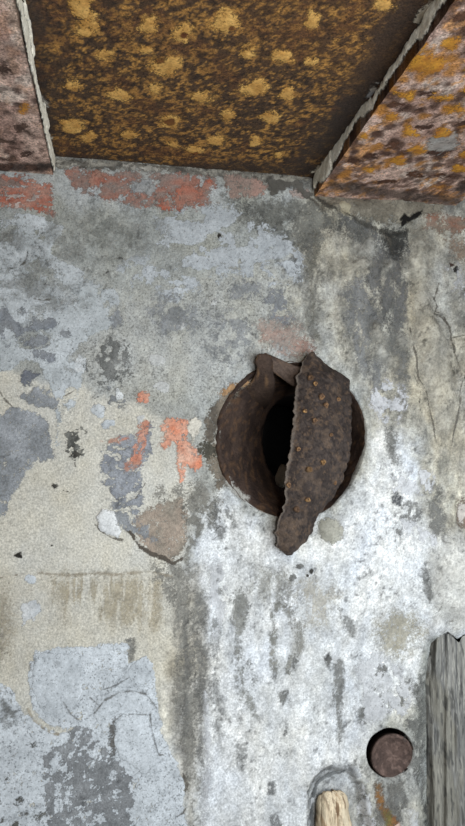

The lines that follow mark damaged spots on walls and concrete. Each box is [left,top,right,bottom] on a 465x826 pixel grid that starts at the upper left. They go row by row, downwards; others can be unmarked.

corrosion [67,0,100,37]
corrosion [139,45,183,95]
corrosion [60,119,97,143]
corrosion [347,89,465,178]
peeling [53,158,465,358]
peeling [0,173,169,516]
crack [410,284,465,442]
water stain [256,570,304,679]
water stain [423,570,434,600]
peeling [0,642,187,826]
water stain [305,612,431,826]
spalling [366,728,413,778]